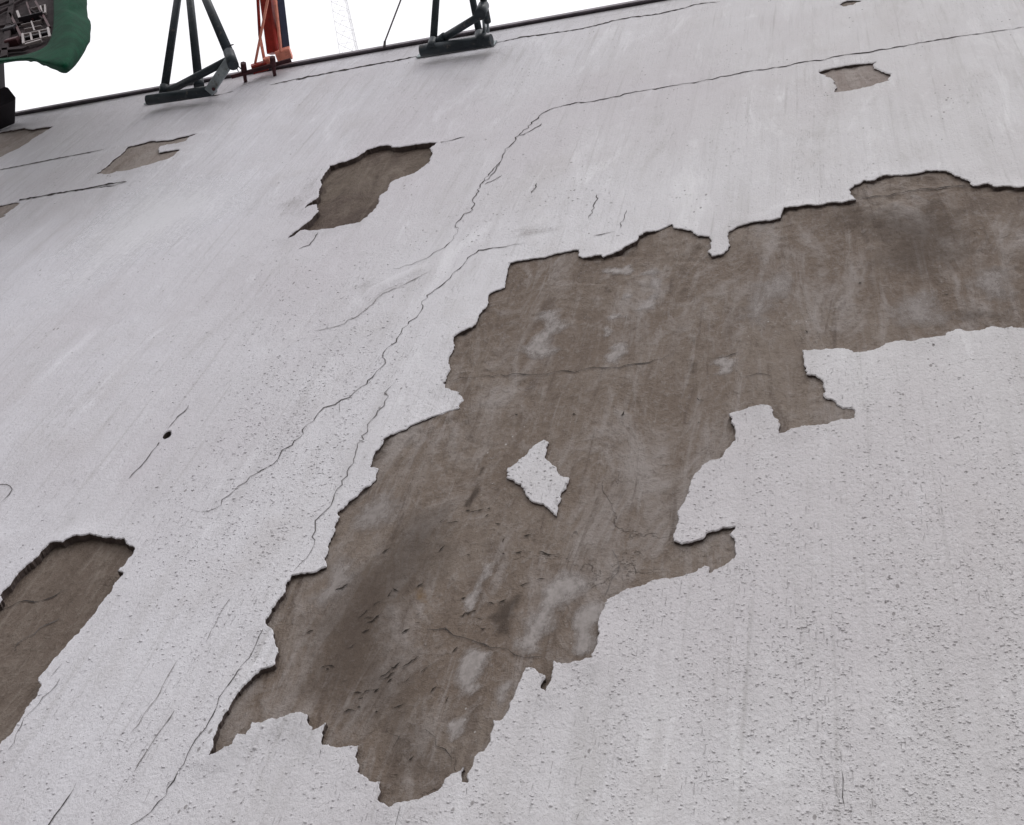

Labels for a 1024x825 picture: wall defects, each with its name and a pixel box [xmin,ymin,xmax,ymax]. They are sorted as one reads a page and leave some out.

flaking render [824,65,890,92]
flaking render [0,129,49,157]
crack [0,149,103,170]
crack [19,181,127,201]
flaking render [98,137,189,174]
flaking render [308,148,432,231]
crack [191,27,1019,567]
flaking render [215,172,1024,807]
flaking render [0,539,134,744]
crack [131,631,262,825]